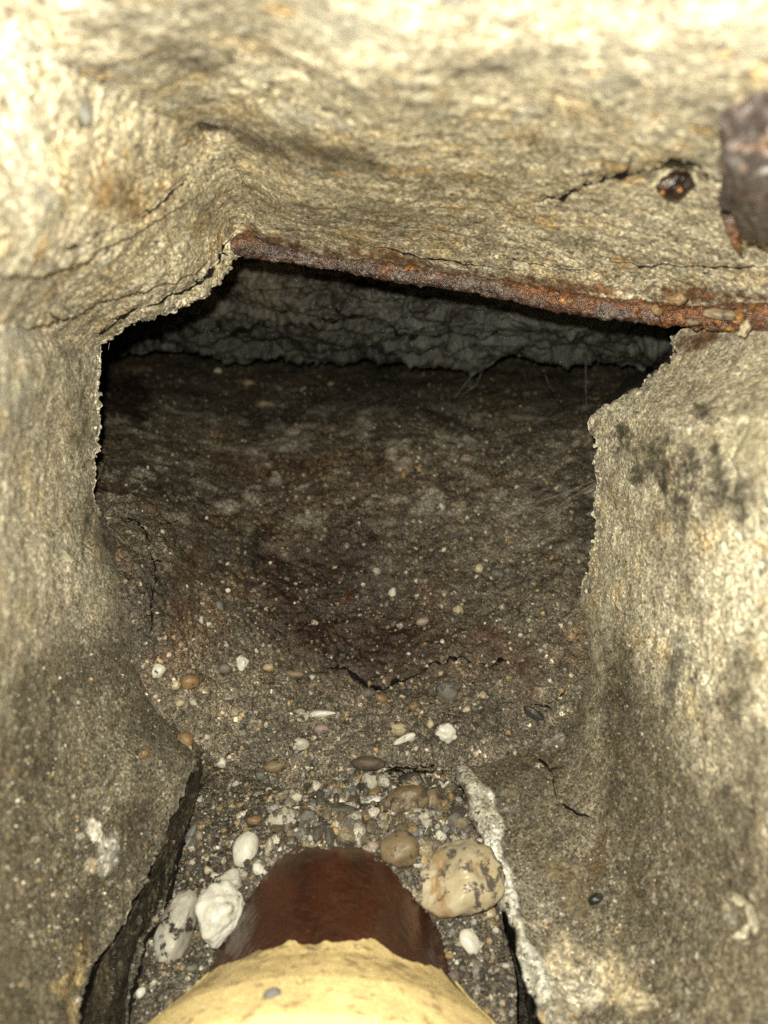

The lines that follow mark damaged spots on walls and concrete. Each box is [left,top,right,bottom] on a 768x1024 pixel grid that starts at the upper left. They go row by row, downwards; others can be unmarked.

crack [66,179,186,251]
crack [534,157,719,202]
crack [98,234,441,350]
rust [230,228,768,352]
crack [325,656,566,710]
crack [536,757,596,820]
crack [128,803,195,1024]